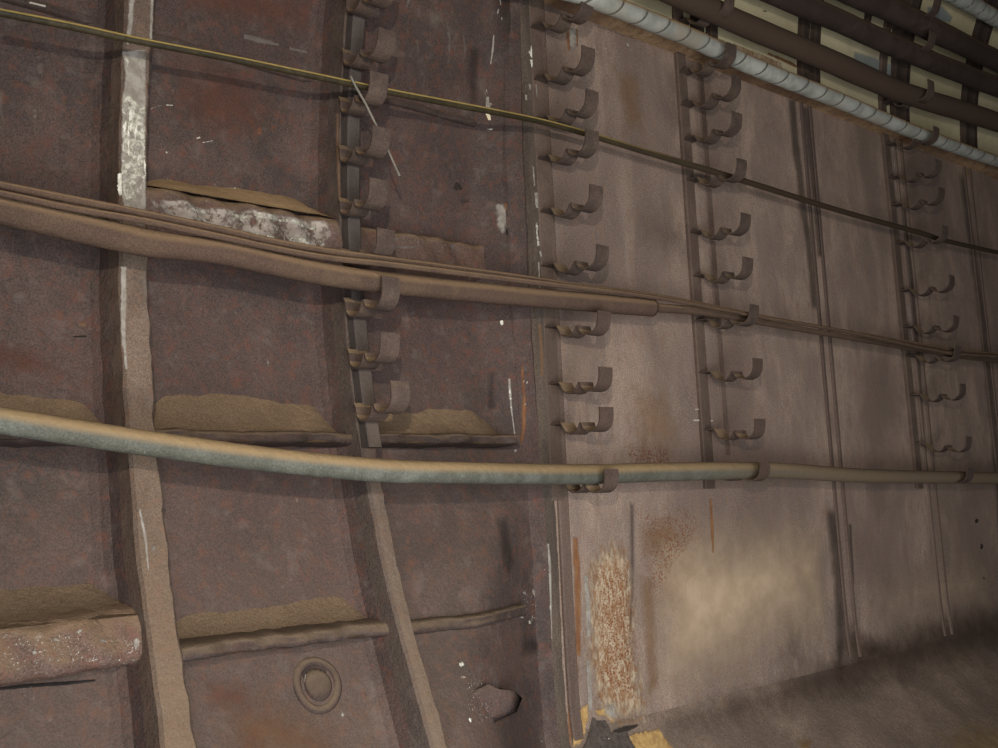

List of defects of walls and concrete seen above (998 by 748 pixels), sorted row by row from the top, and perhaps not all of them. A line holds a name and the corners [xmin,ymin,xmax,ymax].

water stain [117,0,331,247]